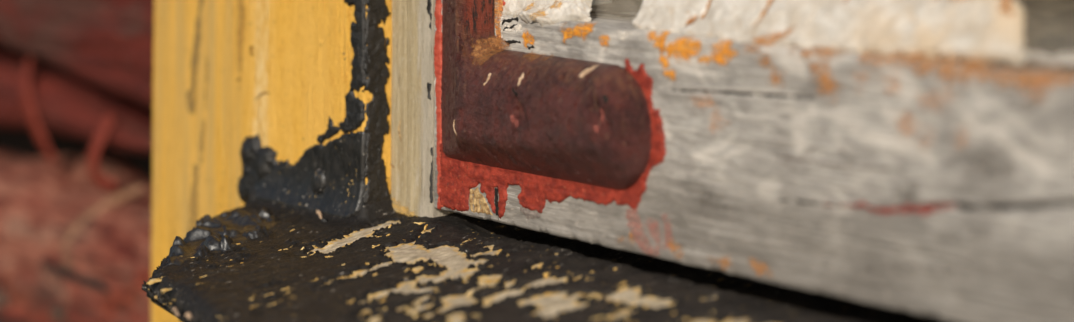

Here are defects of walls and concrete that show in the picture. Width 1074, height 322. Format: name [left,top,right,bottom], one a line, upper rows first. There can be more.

corrosion [472,0,509,65]
corrosion [522,31,548,61]
corrosion [562,23,610,46]
peeling [237,134,289,204]
peeling [301,0,749,322]
crack [910,202,1074,211]